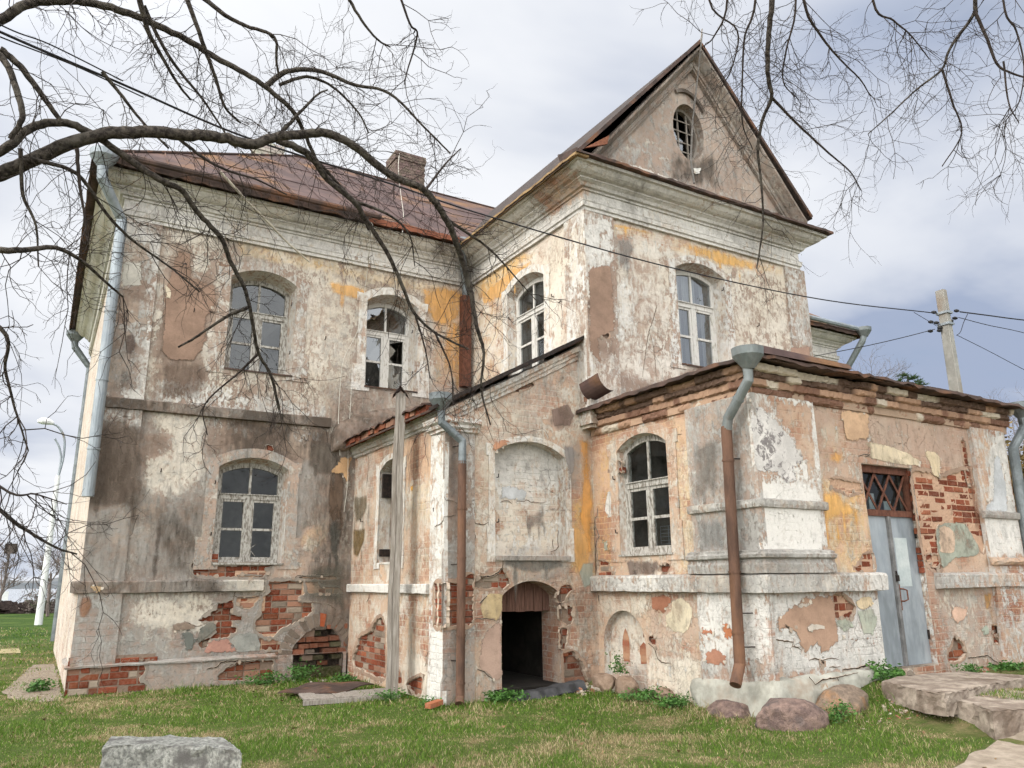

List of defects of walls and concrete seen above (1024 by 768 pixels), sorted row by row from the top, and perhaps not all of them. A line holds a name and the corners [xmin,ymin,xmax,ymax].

peeling [162,251,216,361]
peeling [588,265,615,362]
damp [95,421,138,510]
peeling [748,399,803,483]
spalling [841,410,1007,573]
spalling [57,653,158,697]
spalling [173,554,343,685]
spalling [351,614,425,697]
spalling [432,567,511,632]
spalling [554,584,592,685]
peeling [776,592,873,670]